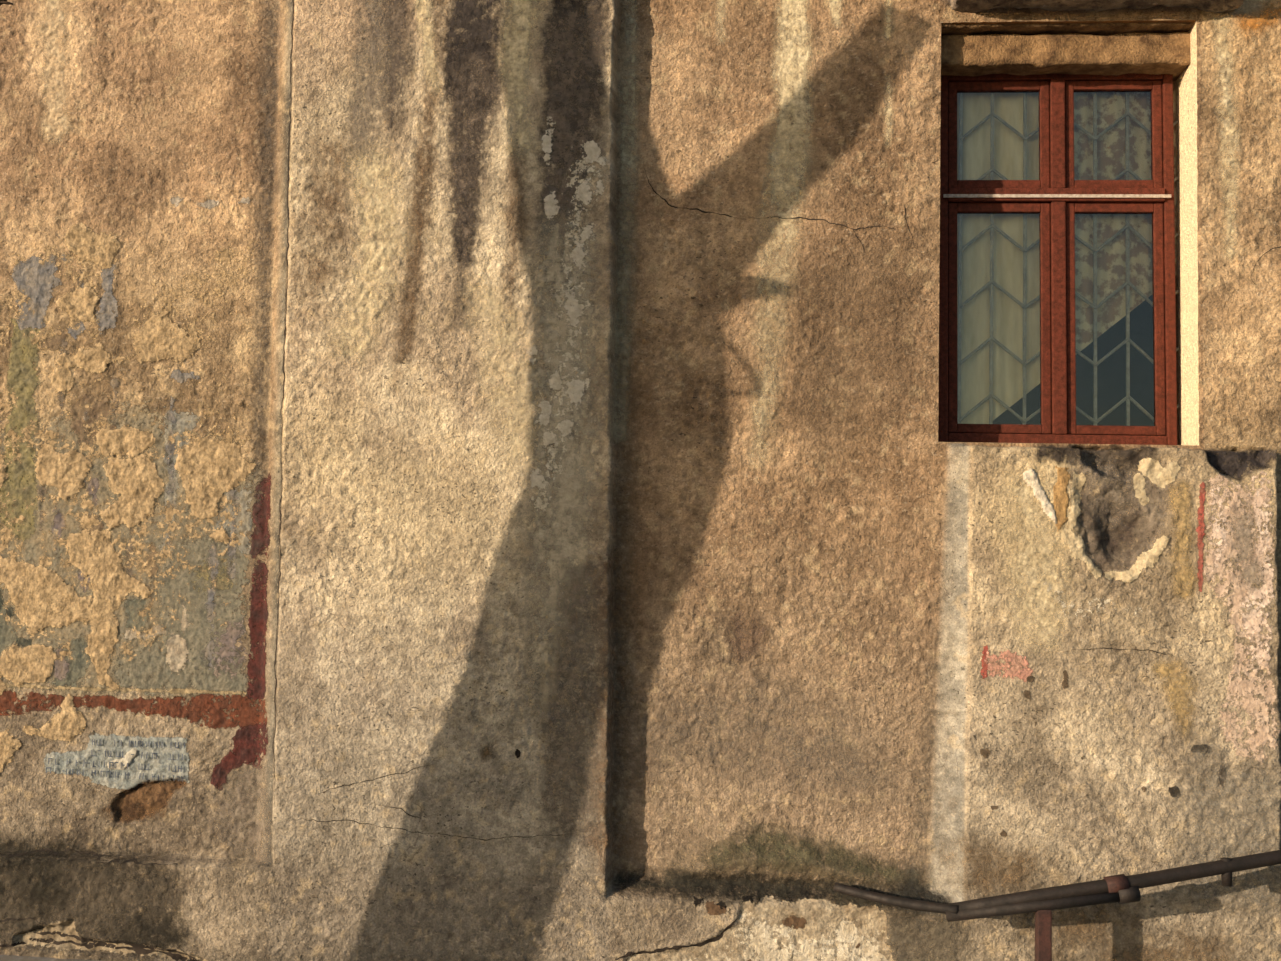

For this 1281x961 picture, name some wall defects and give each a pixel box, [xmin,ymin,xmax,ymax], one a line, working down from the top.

water stain [311,0,608,463]
crack [643,162,914,250]
water stain [0,839,185,949]
spalling [107,779,186,822]
water stain [544,562,621,848]
spalling [615,895,894,961]
spalling [980,458,1181,699]
peeling [1195,470,1281,766]